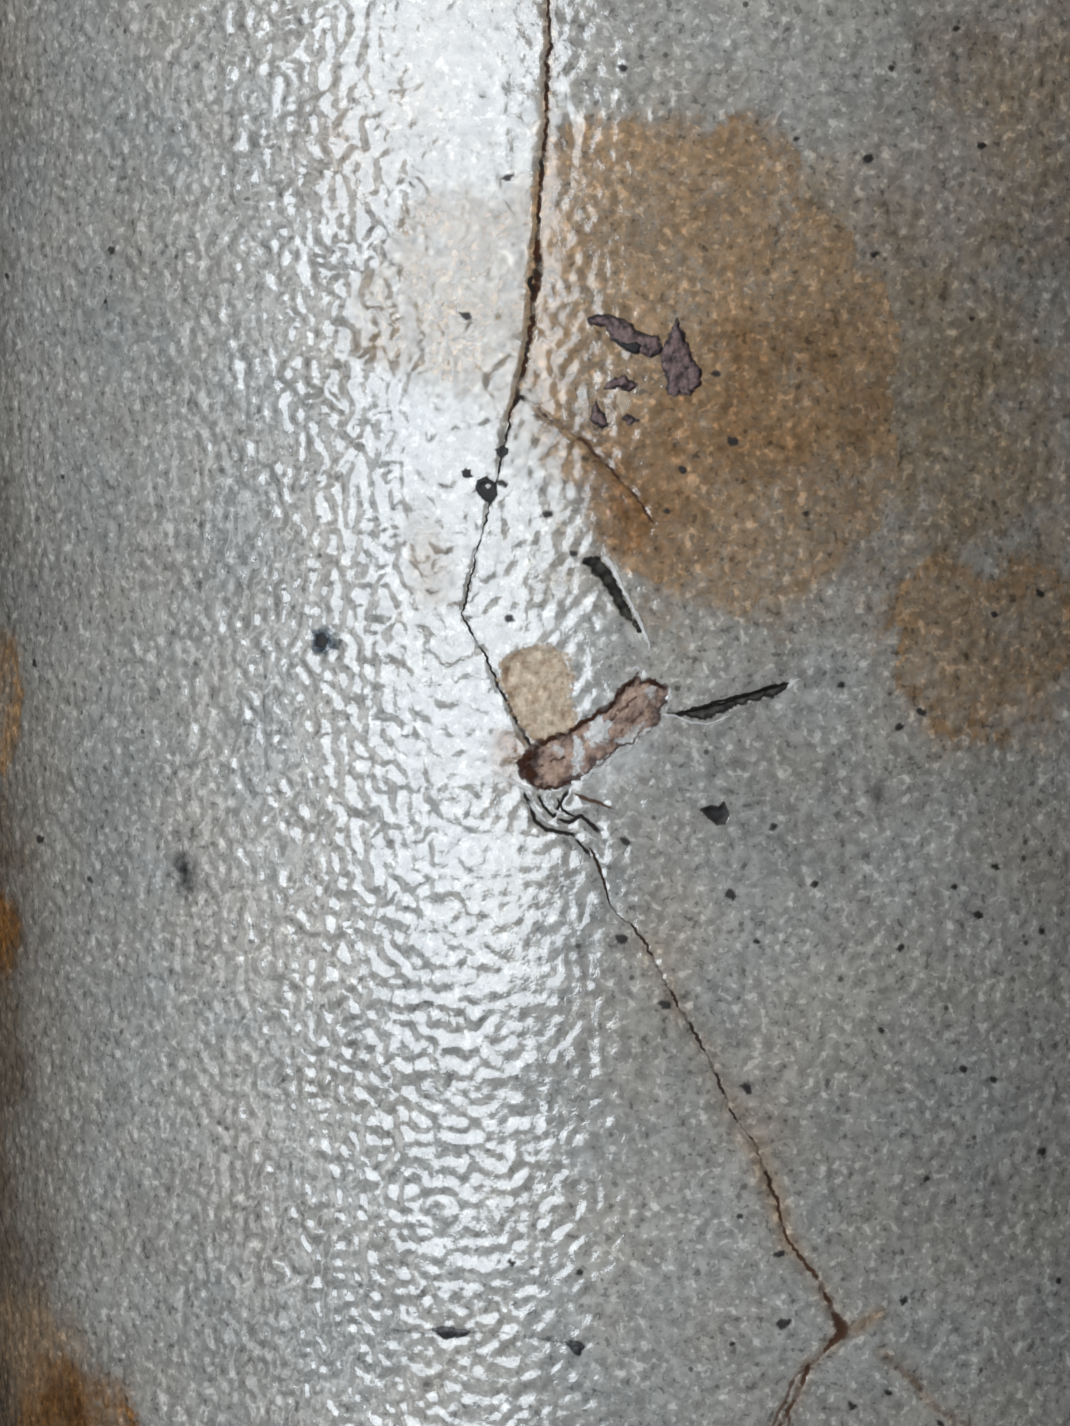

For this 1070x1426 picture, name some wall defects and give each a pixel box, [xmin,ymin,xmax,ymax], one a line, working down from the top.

crack [461,0,553,746]
peeling [590,375,639,430]
peeling [587,314,702,397]
crack [578,437,652,521]
spalling [582,556,650,649]
spalling [496,644,799,790]
crack [495,772,653,956]
crack [670,990,848,1426]
rust [13,1315,138,1426]